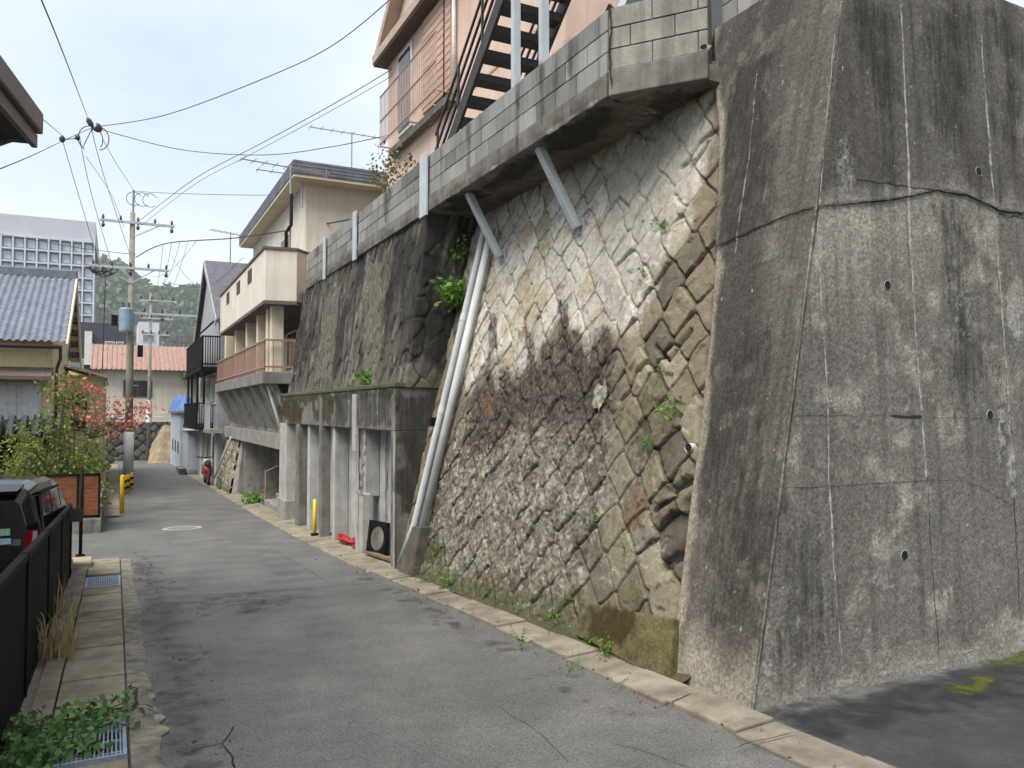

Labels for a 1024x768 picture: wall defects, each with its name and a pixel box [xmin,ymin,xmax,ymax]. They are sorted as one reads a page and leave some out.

leakage [435,92,708,458]
crack [703,177,1024,254]
crack [787,369,1021,614]